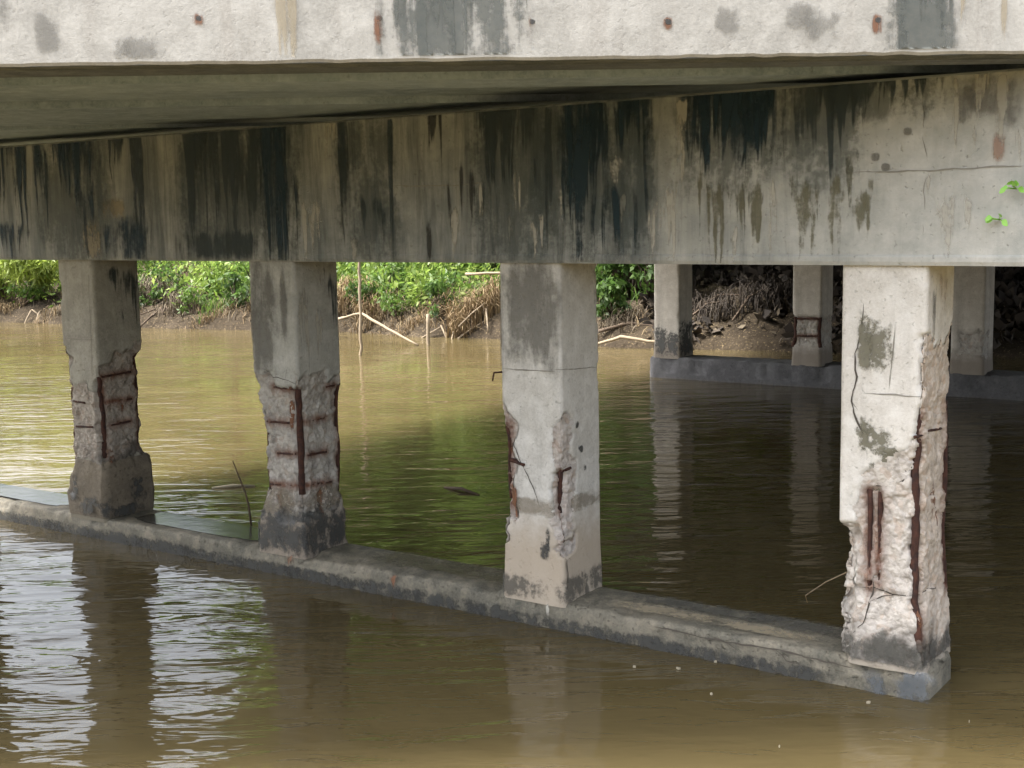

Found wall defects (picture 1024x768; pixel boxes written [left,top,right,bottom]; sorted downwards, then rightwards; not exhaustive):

damp [394,0,523,56]
rust [872,15,881,33]
damp [0,137,152,259]
damp [182,126,320,260]
damp [447,78,926,363]
crack [860,101,1017,231]
spalling [66,339,146,467]
spalling [255,370,341,523]
spalling [503,405,525,542]
spalling [549,413,586,557]
crack [851,304,921,433]
spalling [841,323,952,668]